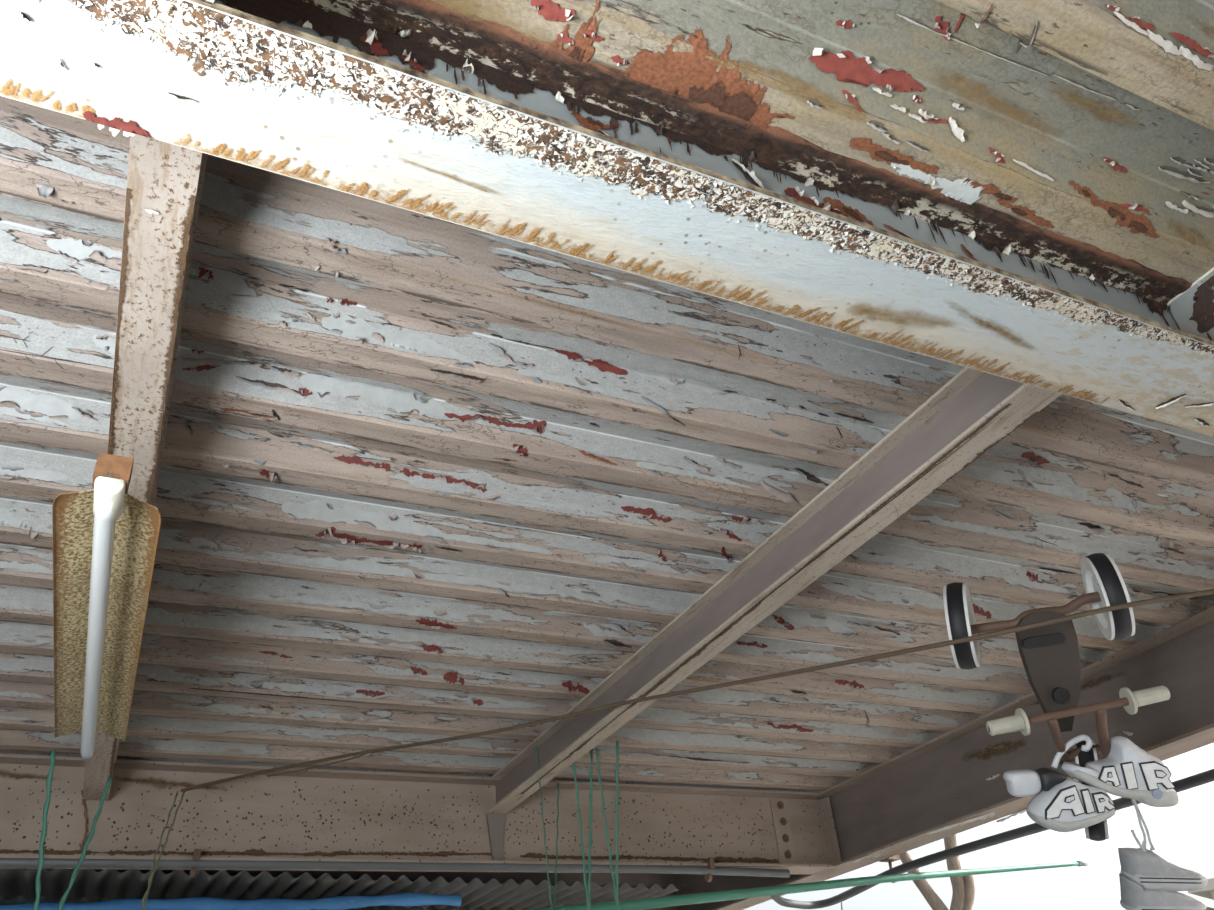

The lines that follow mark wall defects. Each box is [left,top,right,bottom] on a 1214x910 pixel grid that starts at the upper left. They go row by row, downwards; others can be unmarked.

peeling [17,0,1214,358]
rust [200,0,1214,341]
peeling [198,267,485,383]
peeling [0,386,98,426]
peeling [181,349,546,435]
peeling [488,334,685,426]
peeling [1156,394,1214,427]
peeling [0,466,69,483]
peeling [294,442,672,523]
peeling [636,456,828,505]
peeling [201,499,675,648]
peeling [907,507,1185,563]